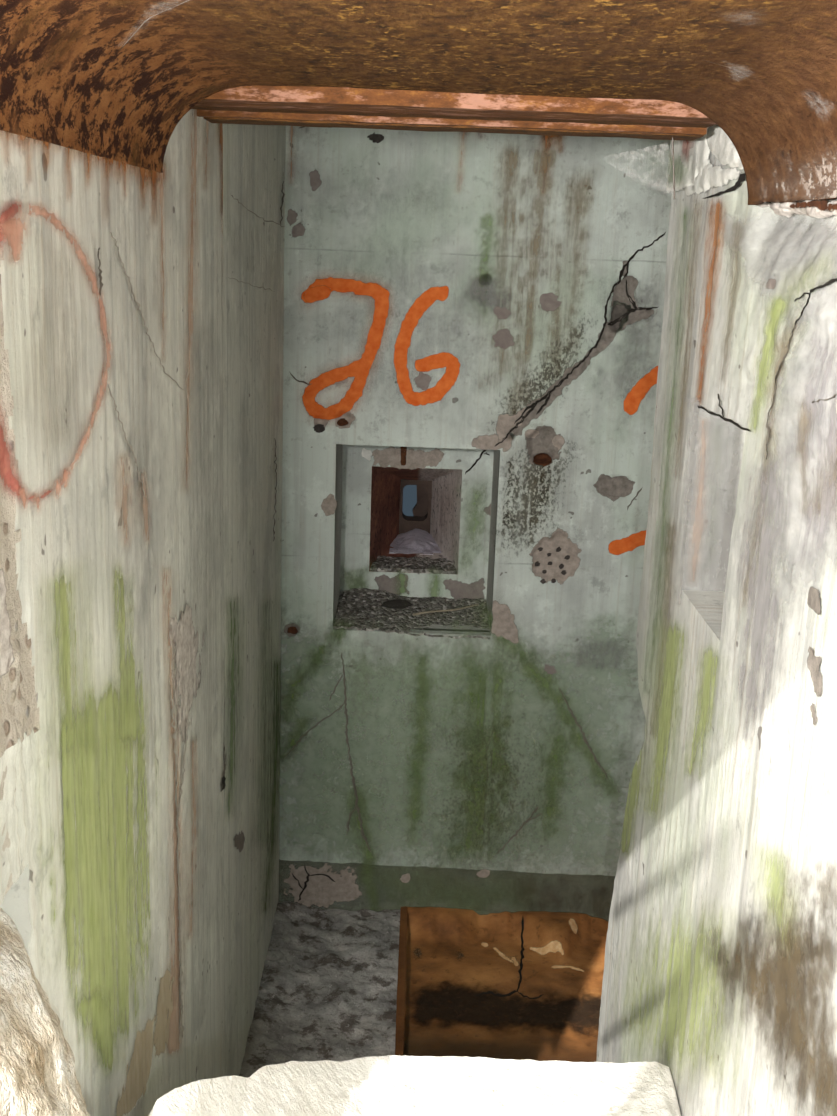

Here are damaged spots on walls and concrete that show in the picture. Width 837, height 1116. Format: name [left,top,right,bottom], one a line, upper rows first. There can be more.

rust [68,148,165,199]
rust [187,109,223,423]
spalling [471,261,654,468]
crack [465,231,666,474]
crack [703,173,745,199]
crack [698,278,837,459]
spalling [529,528,582,585]
damp [55,575,88,750]
damp [114,570,144,741]
damp [278,656,615,922]